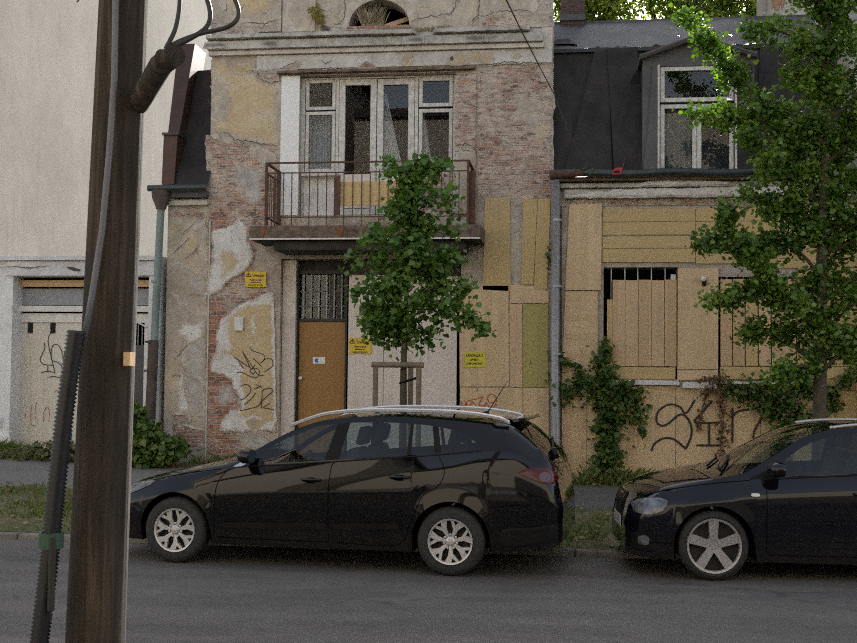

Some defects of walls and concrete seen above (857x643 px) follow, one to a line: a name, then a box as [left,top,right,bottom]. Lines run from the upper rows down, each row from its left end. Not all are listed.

crack [413,0,533,27]
spalling [446,52,556,213]
peeling [169,59,302,462]